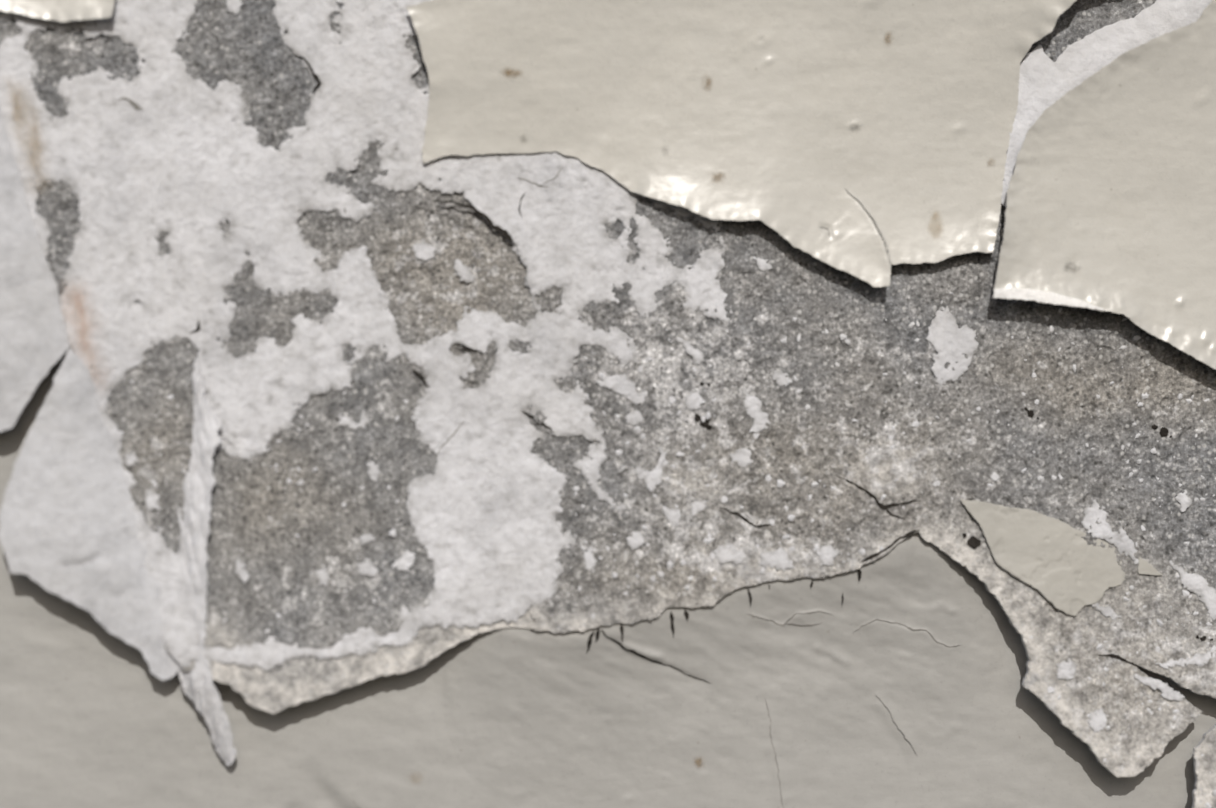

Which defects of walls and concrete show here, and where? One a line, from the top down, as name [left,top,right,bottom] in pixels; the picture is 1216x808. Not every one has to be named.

spalling [0,0,146,121]
spalling [172,0,319,151]
spalling [329,2,350,44]
spalling [0,111,564,766]
spalling [403,0,1216,778]
spalling [1193,725,1216,808]